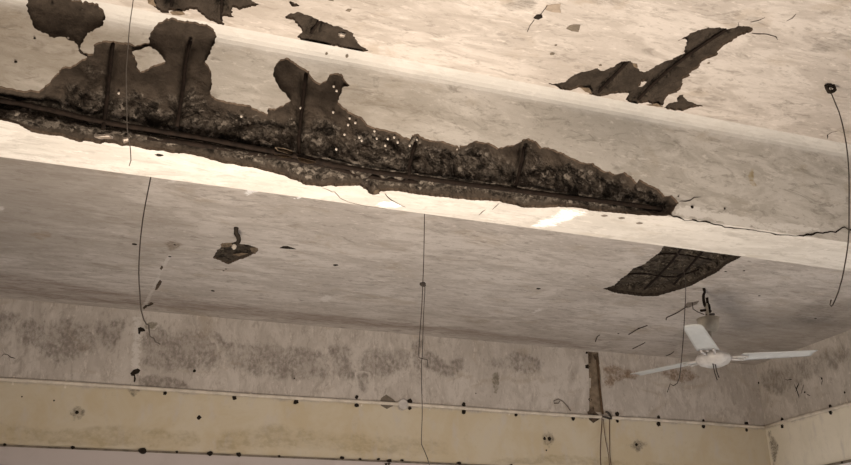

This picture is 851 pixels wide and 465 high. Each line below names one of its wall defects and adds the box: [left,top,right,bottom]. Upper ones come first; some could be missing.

spalling [549,18,778,111]
spalling [0,0,678,216]
crack [671,197,851,237]
spalling [213,243,258,264]
spalling [603,246,741,296]
damp [0,309,130,371]
damp [126,317,467,398]
damp [479,347,546,395]